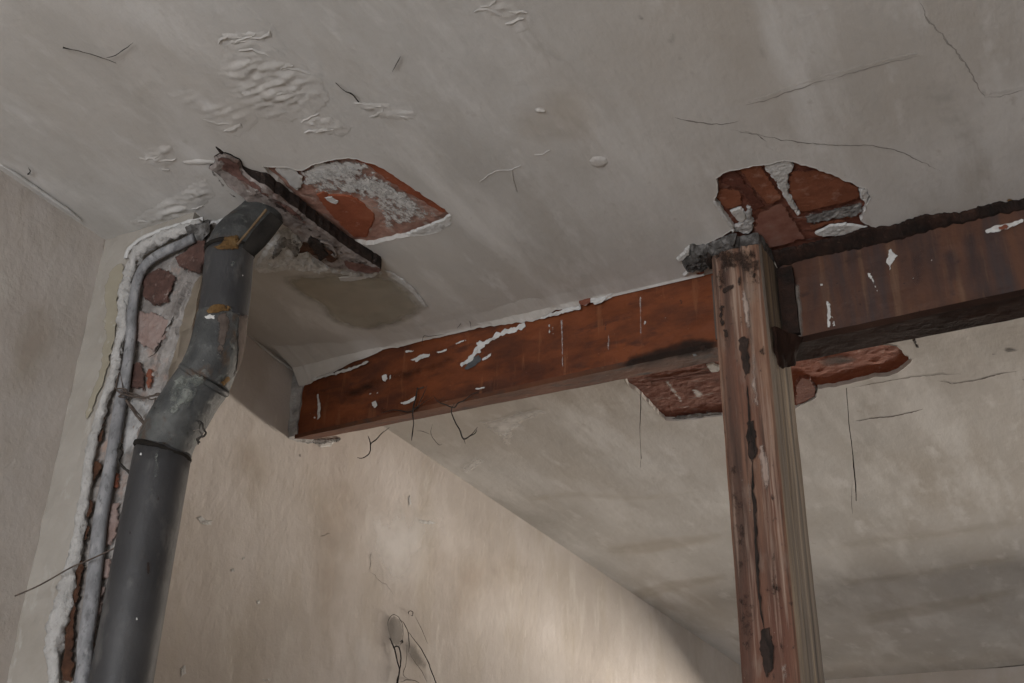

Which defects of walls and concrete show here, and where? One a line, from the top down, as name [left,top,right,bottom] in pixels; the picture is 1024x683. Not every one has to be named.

crack [918,0,1021,97]
crack [678,56,940,171]
flaking render [253,228,383,278]
flaking render [262,157,453,246]
flaking render [706,160,876,263]
flaking render [625,361,723,421]
flaking render [791,344,913,410]
crack [853,371,1017,388]
flaking render [59,218,223,682]